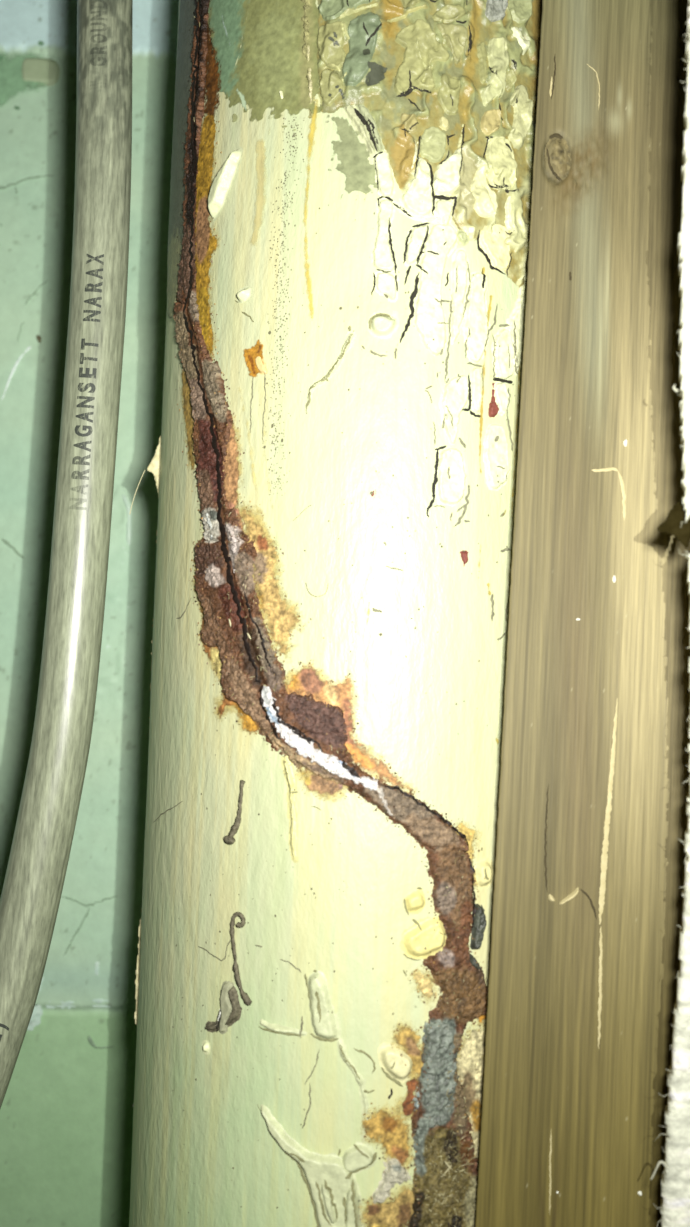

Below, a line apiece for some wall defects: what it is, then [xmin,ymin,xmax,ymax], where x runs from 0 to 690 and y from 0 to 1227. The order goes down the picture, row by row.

corrosion [251,141,265,244]
corrosion [305,106,317,219]
corrosion [305,237,313,318]
peeling [300,0,542,507]
crack [354,0,519,526]
corrosion [244,340,268,439]
crack [167,0,489,1227]
crack [491,594,508,640]